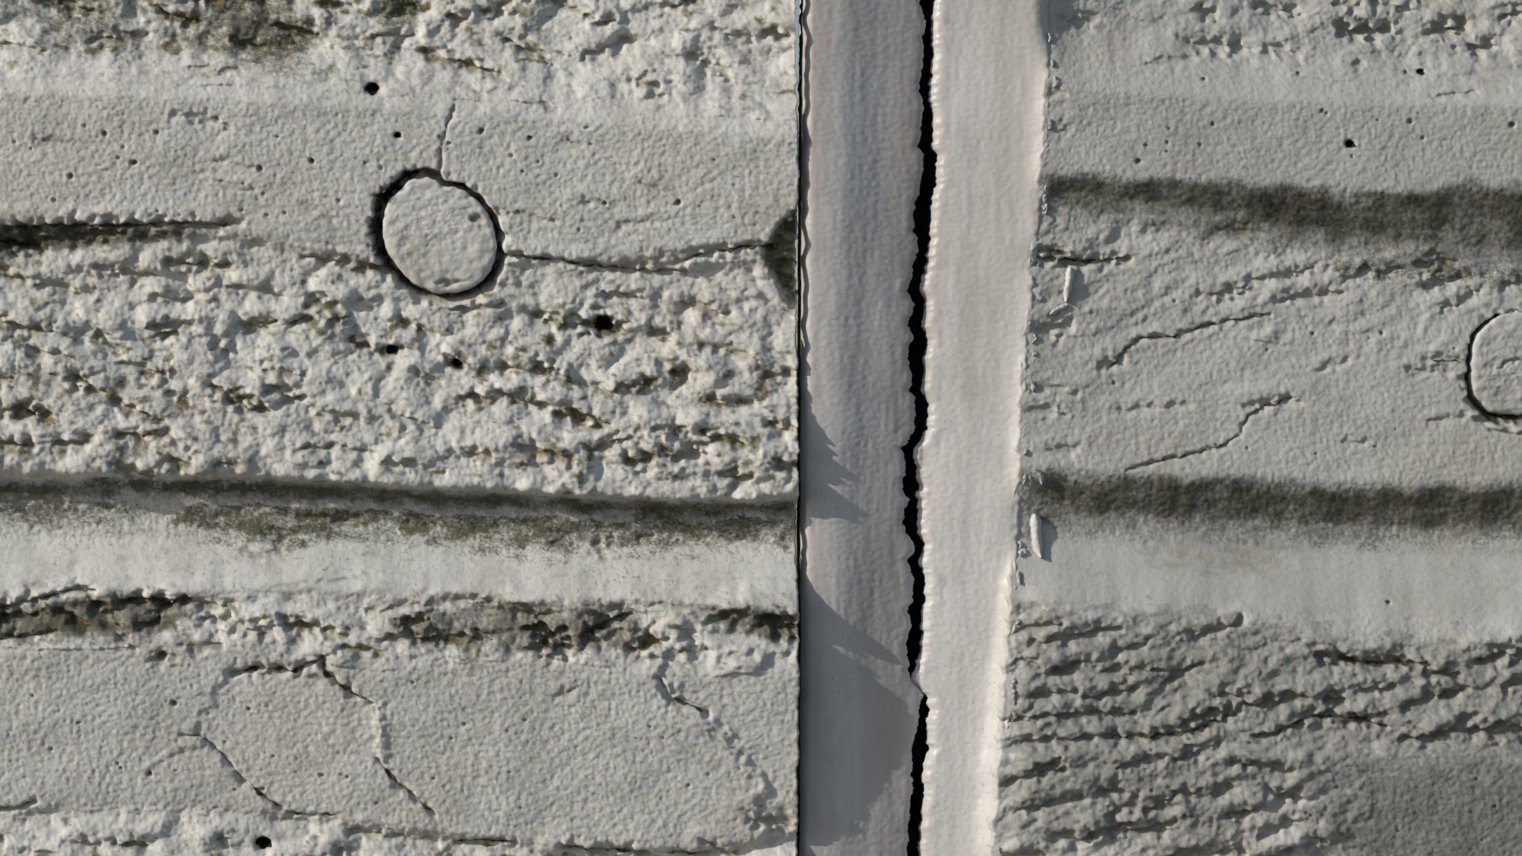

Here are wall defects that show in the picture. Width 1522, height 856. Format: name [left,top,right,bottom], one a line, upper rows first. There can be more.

leakage [1048,176,1522,286]
crack [1111,314,1265,366]
crack [369,0,803,856]
crack [901,0,937,856]
crack [1133,397,1291,468]
leakage [0,477,794,564]
leakage [1031,473,1522,548]
crack [238,661,364,698]
crack [194,734,335,816]